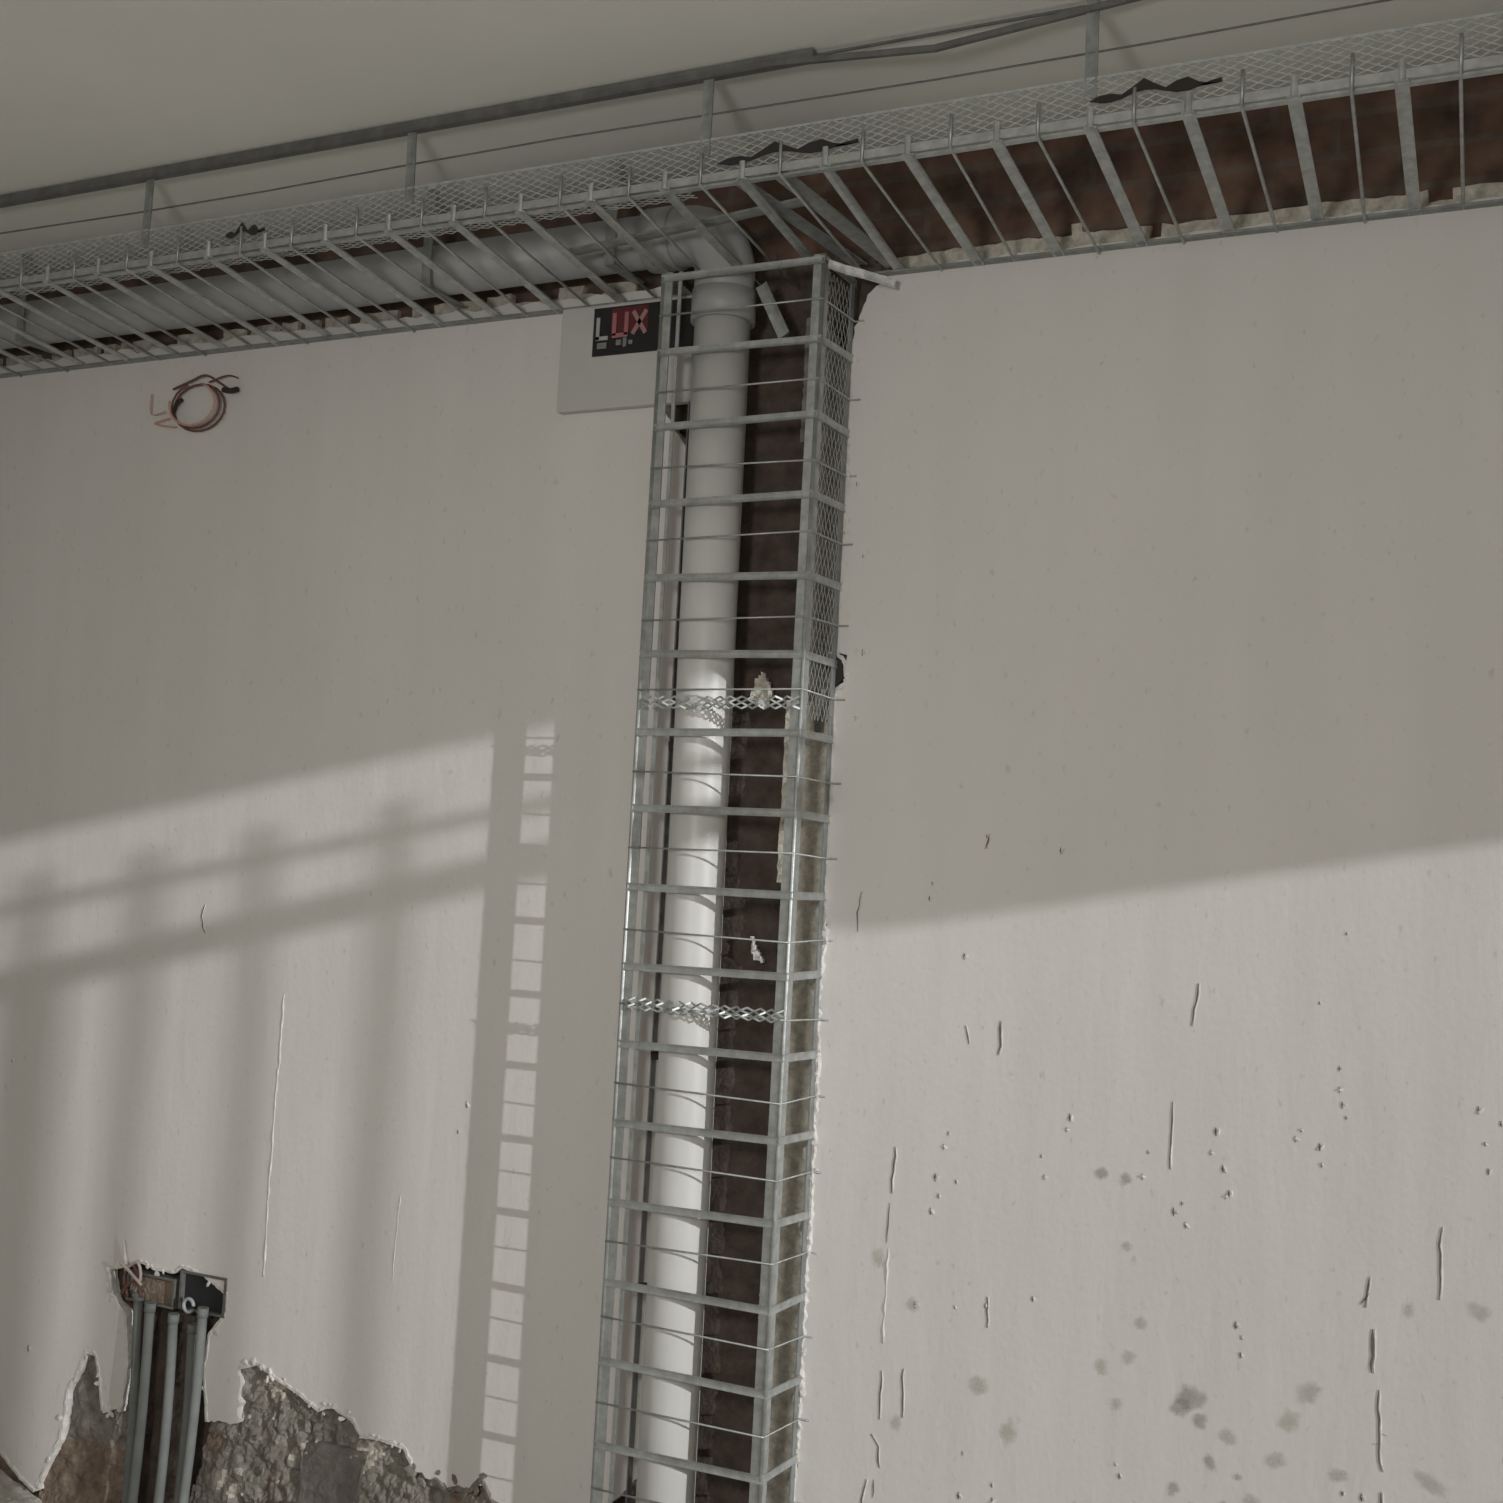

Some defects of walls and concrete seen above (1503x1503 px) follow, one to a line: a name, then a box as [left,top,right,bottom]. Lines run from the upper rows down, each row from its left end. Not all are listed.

flaking render [0,1259,499,1503]